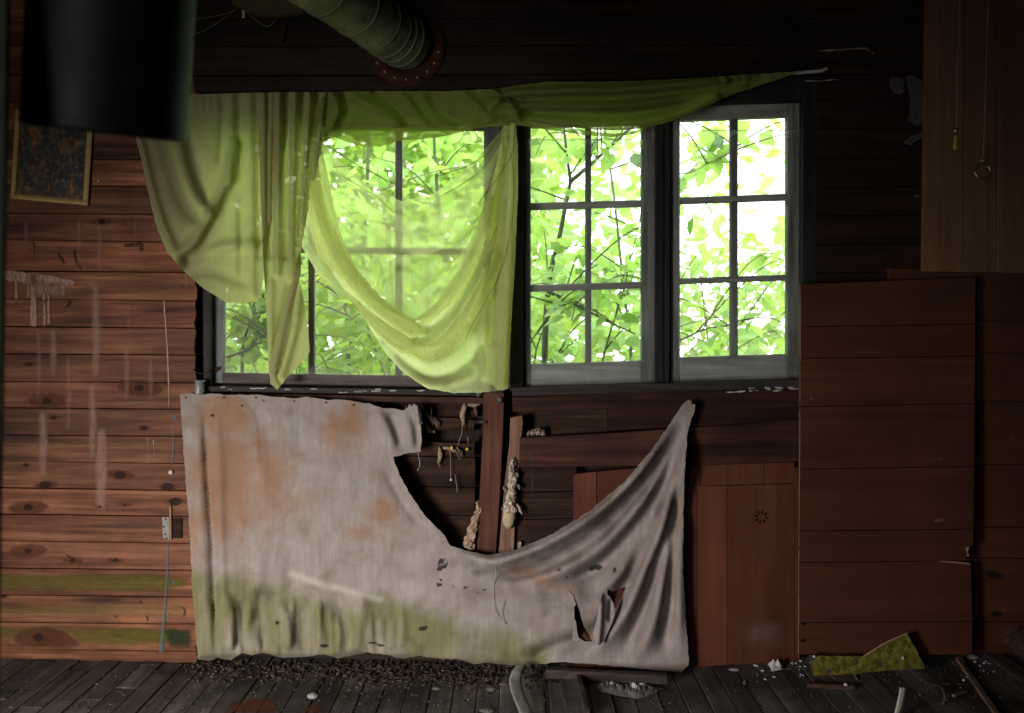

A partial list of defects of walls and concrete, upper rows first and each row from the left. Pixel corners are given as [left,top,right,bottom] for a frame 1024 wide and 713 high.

spalling [463,500,482,552]